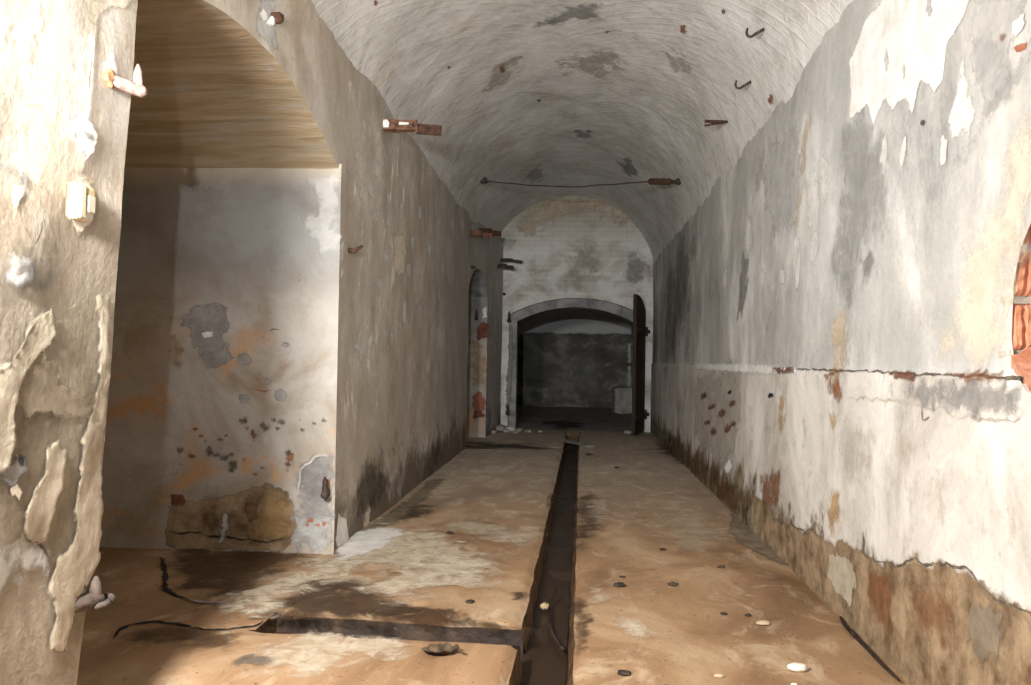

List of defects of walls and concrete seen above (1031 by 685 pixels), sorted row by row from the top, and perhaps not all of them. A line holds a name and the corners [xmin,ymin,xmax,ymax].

peeling [849,0,969,126]
flaking render [1012,14,1027,52]
peeling [880,135,906,173]
peeling [780,156,828,289]
spalling [180,303,252,368]
crack [696,363,1022,423]
flaking render [0,294,112,652]
damp [163,440,540,672]
damp [137,625,236,646]